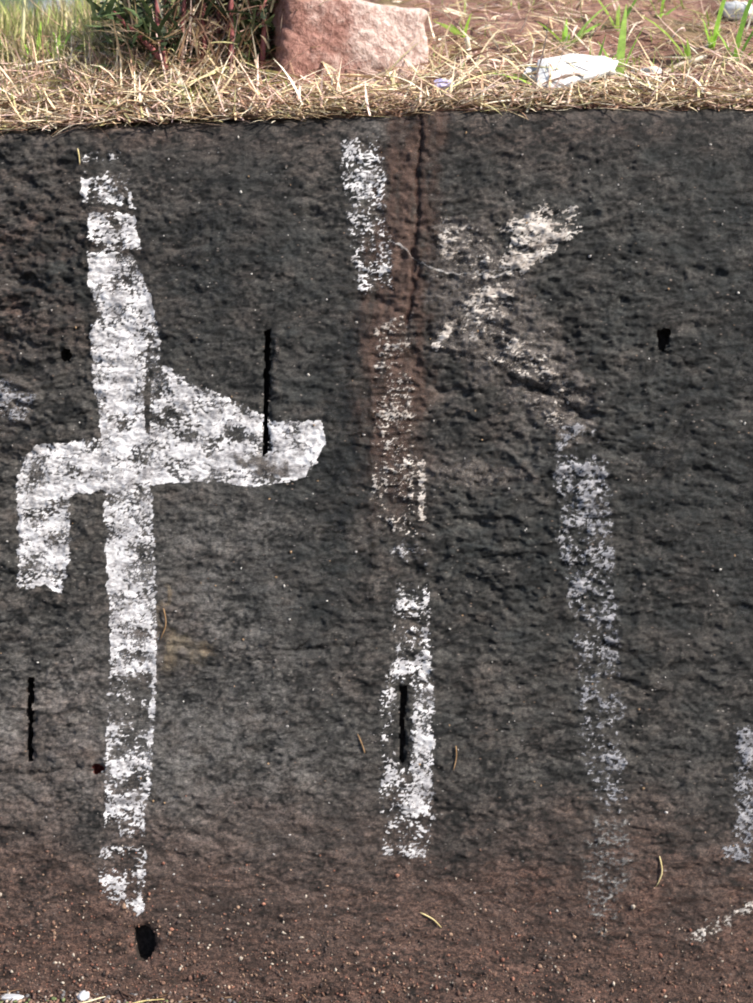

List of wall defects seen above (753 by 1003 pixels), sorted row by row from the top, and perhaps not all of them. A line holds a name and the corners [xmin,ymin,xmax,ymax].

corrosion [353,111,449,511]